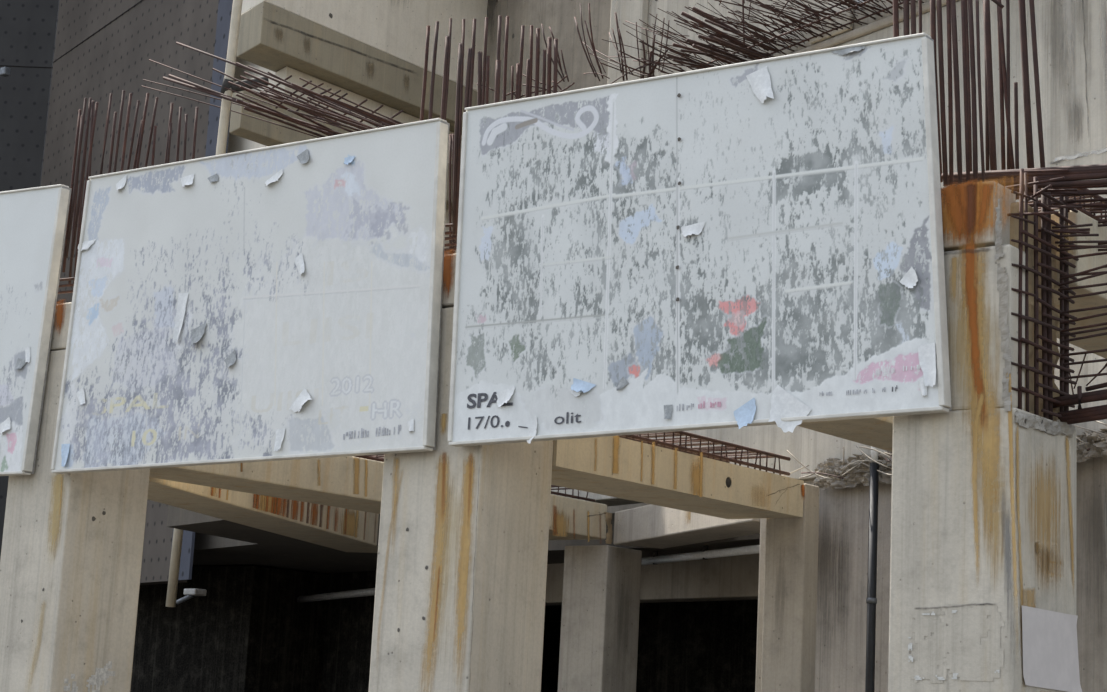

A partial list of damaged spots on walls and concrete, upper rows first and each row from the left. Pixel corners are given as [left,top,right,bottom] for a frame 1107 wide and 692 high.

spalling [420,0,1107,437]
corrosion [253,494,366,538]
corrosion [354,458,368,497]
corrosion [427,458,449,676]
corrosion [456,459,474,658]
corrosion [692,452,703,497]
corrosion [941,178,1074,631]